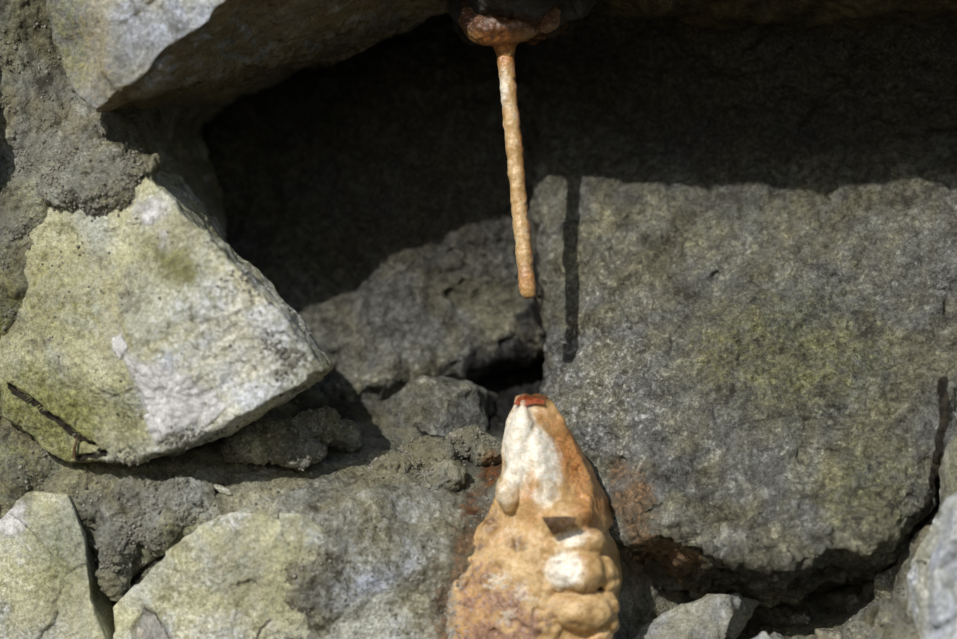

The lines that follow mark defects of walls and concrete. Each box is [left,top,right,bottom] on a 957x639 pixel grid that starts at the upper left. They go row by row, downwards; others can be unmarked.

crack [8,384,108,461]